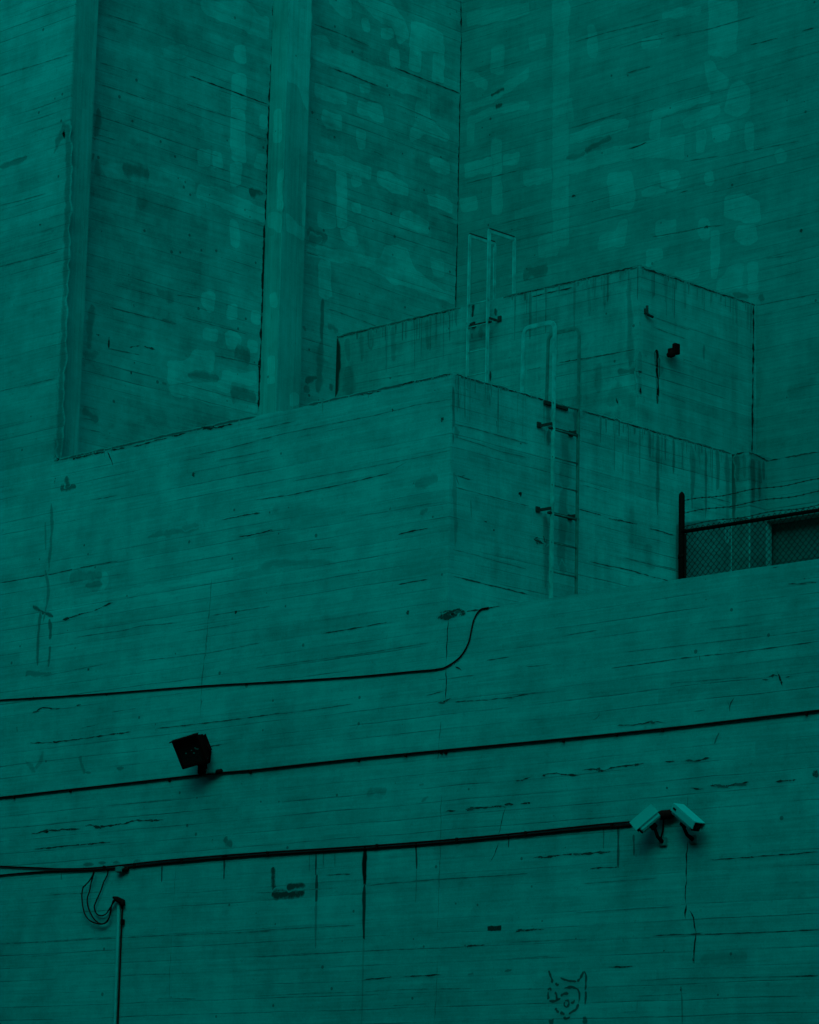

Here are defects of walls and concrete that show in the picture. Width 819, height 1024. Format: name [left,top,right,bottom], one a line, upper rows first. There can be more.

leakage [302,266,766,588]
crack [576,842,819,981]